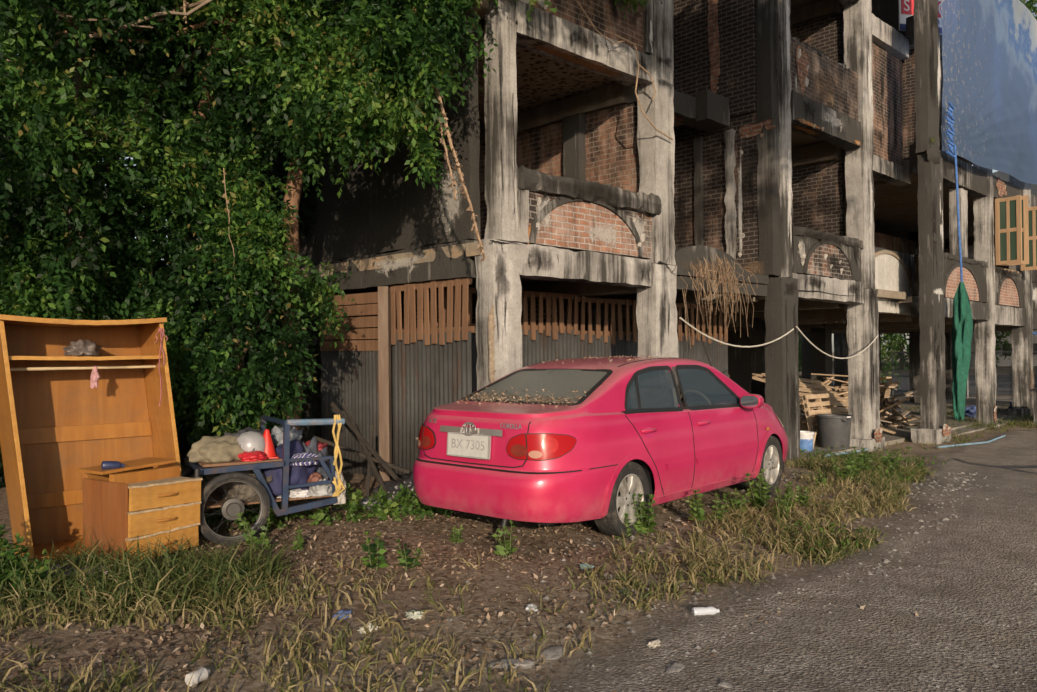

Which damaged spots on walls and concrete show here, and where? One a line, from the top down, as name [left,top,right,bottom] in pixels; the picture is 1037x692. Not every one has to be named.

spalling [795,46,810,95]
damp [543,179,655,219]
damp [528,249,547,269]
damp [495,259,507,337]